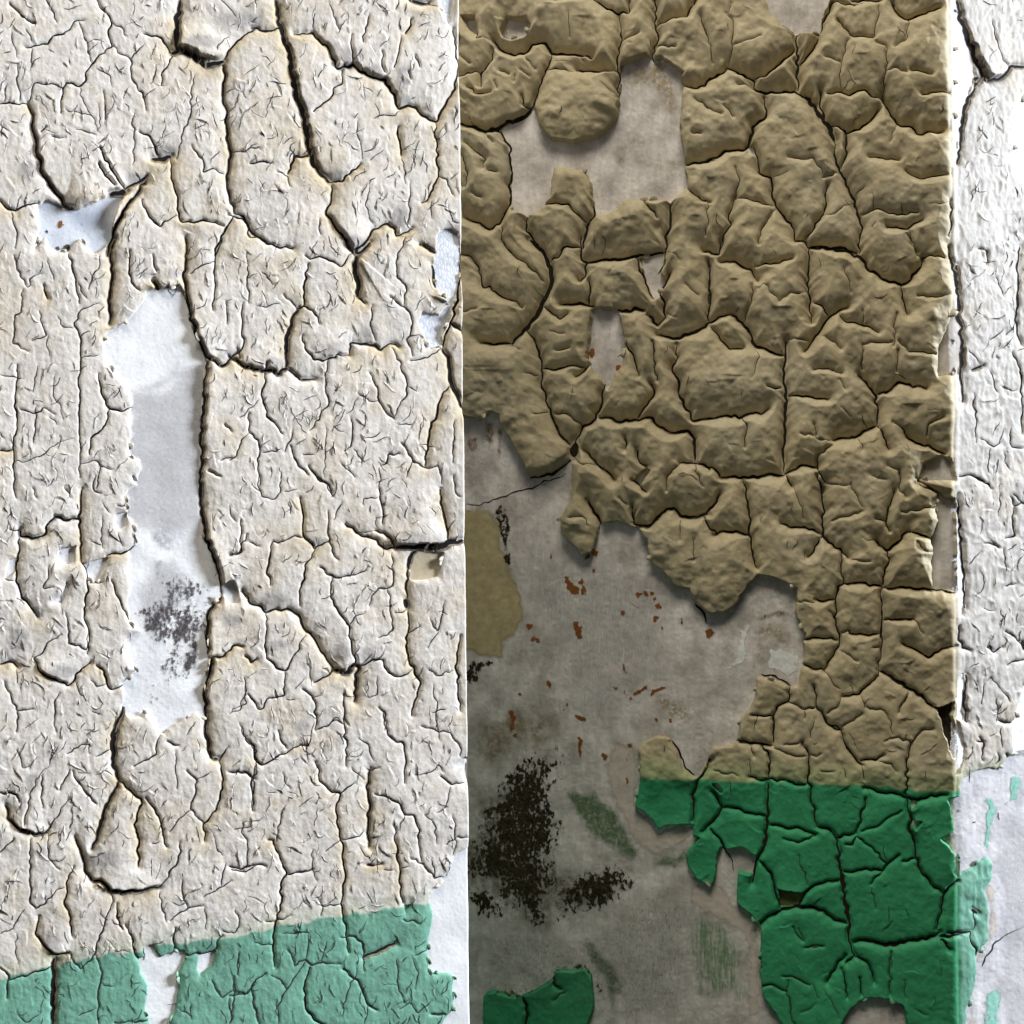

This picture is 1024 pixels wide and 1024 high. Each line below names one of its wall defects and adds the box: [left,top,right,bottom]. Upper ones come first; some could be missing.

peeling [502,58,688,217]
peeling [103,285,238,734]
damp [135,562,215,705]
crack [0,0,638,1024]
corrosion [564,549,598,595]
peeling [426,413,805,1024]
corrosion [613,685,665,700]
corrosion [636,591,663,630]
crack [470,0,1024,996]
damp [467,748,634,926]
peeling [933,674,1024,1024]
crack [764,976,839,1024]